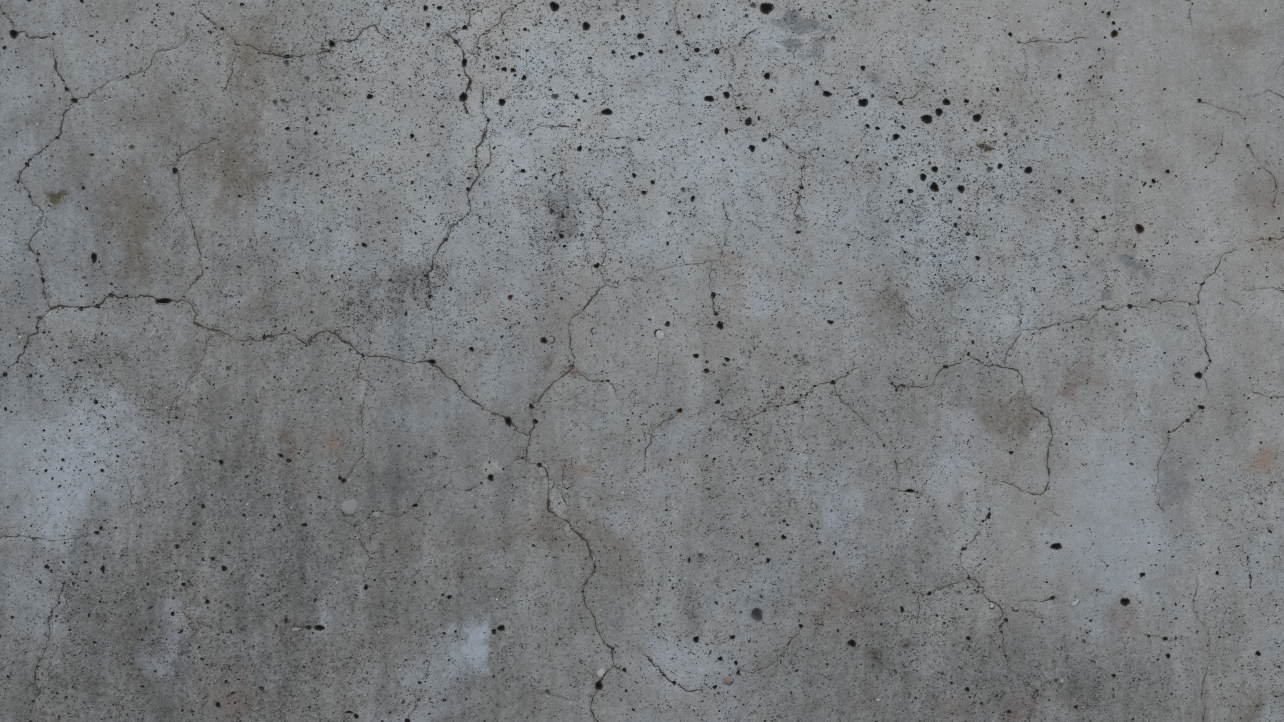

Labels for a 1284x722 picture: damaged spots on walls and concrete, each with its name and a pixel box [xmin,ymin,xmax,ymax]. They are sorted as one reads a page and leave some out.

crack [674,3,758,112]
crack [766,135,814,219]
crack [1200,59,1284,206]
crack [0,1,731,722]
crack [723,236,1284,722]